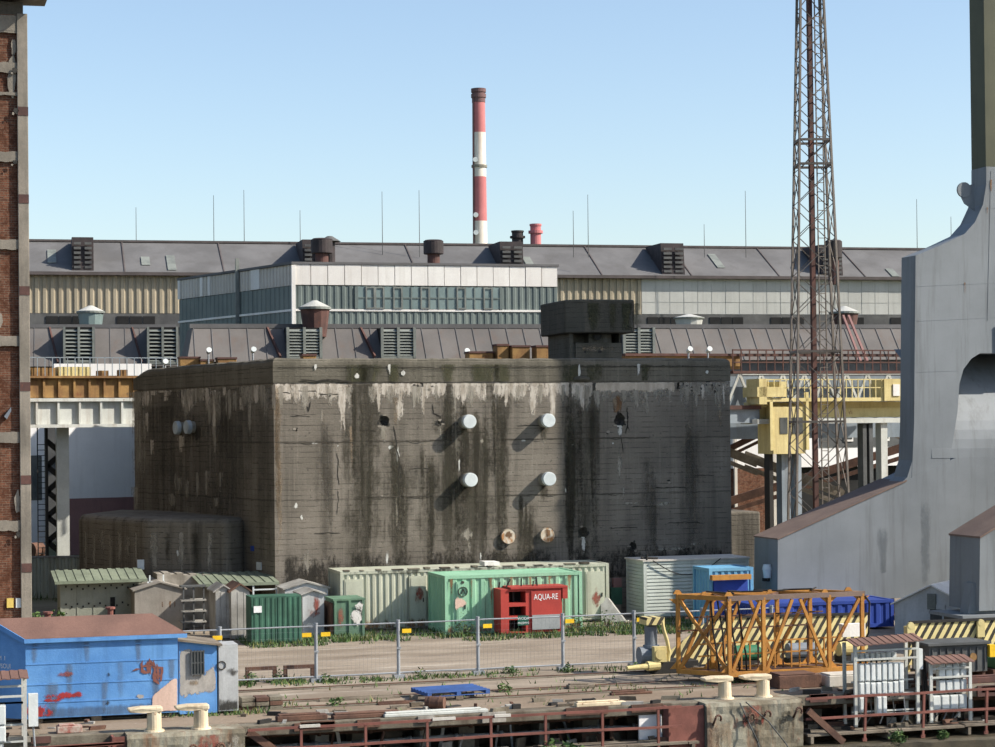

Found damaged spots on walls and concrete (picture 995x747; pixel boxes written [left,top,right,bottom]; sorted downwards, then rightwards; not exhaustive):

leakage [127,364,599,572]
peeling [593,381,723,435]